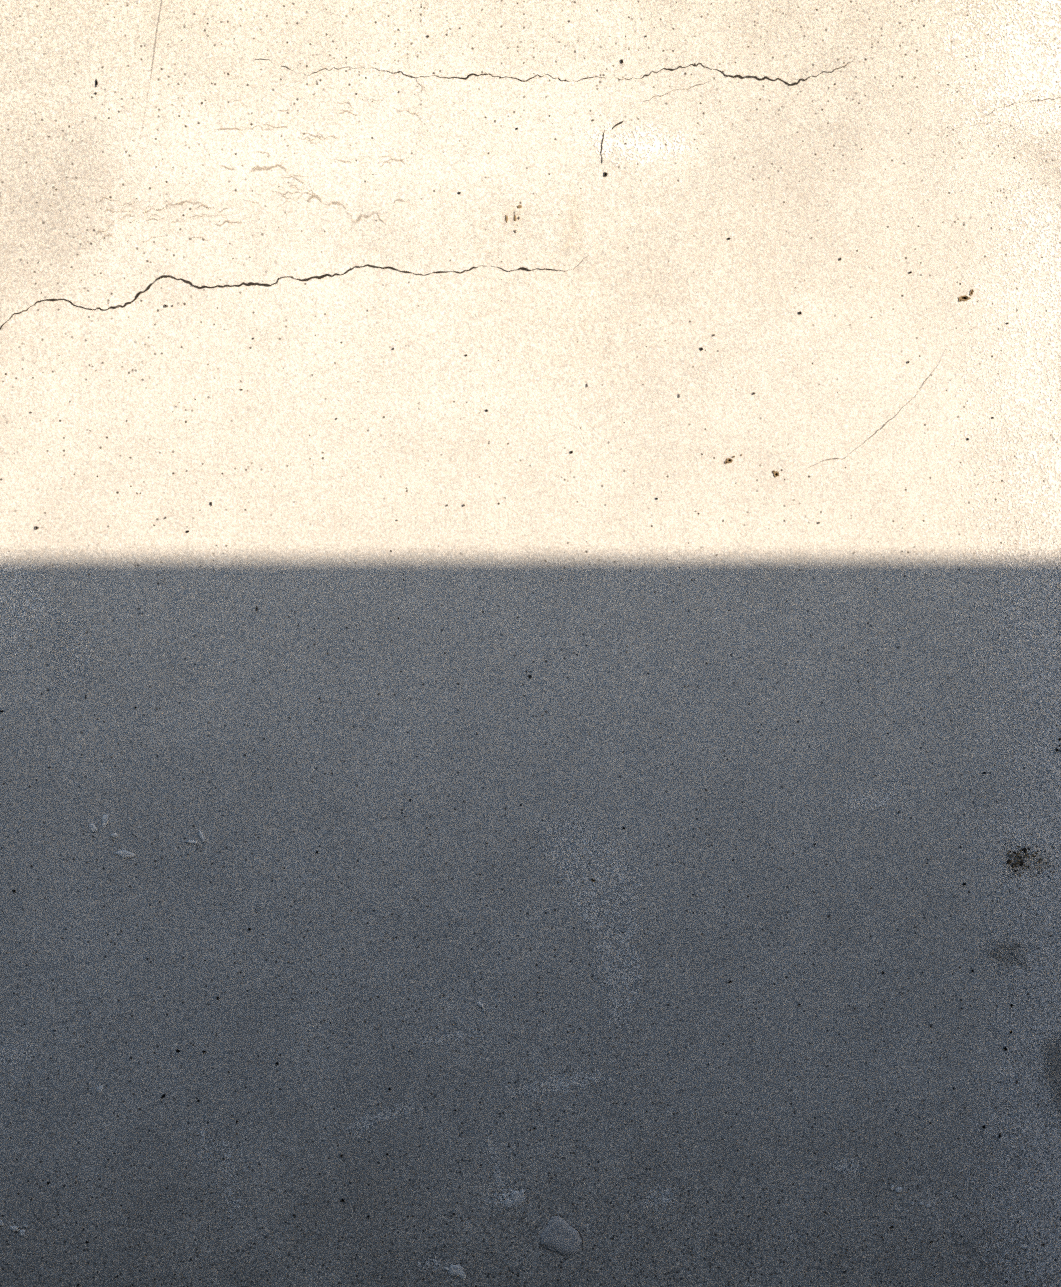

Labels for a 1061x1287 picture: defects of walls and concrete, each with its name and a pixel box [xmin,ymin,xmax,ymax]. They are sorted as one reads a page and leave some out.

crack [256,59,852,101]
crack [0,256,588,330]
water stain [899,0,1061,1287]